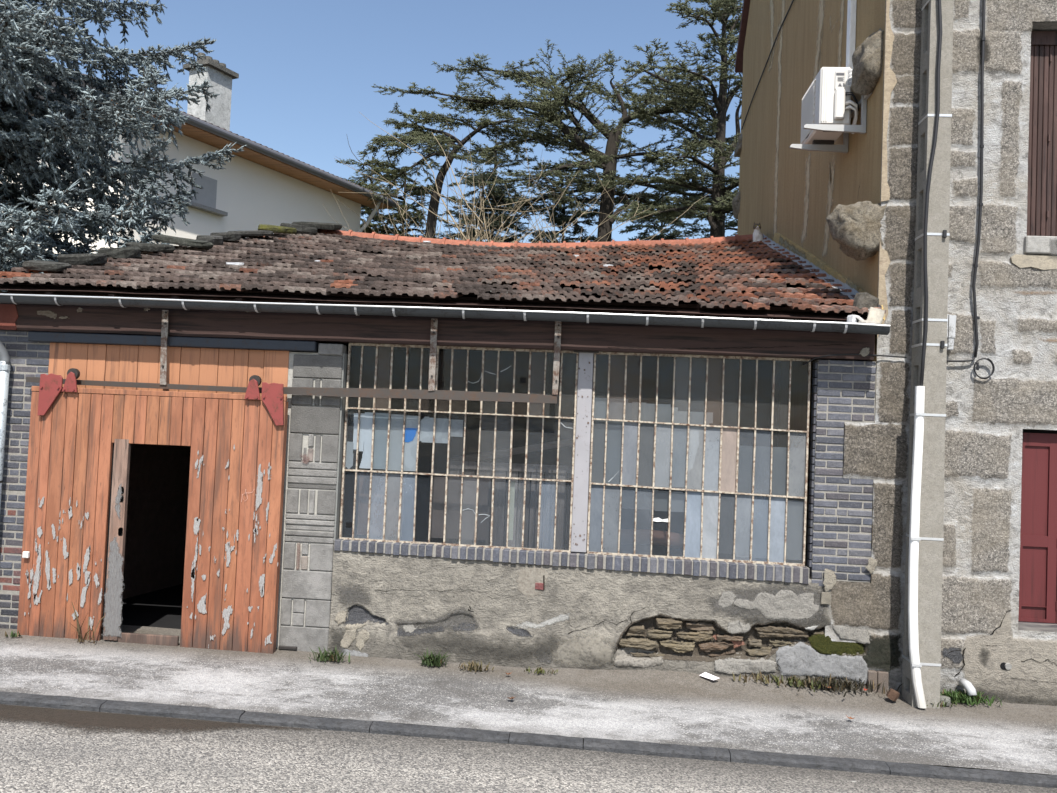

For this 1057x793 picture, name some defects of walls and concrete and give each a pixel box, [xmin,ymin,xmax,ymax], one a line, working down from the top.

peeling [24,497,123,637]
peeling [187,462,278,648]
spalling [334,585,478,657]
flaking render [507,614,569,637]
flaking render [612,569,870,668]